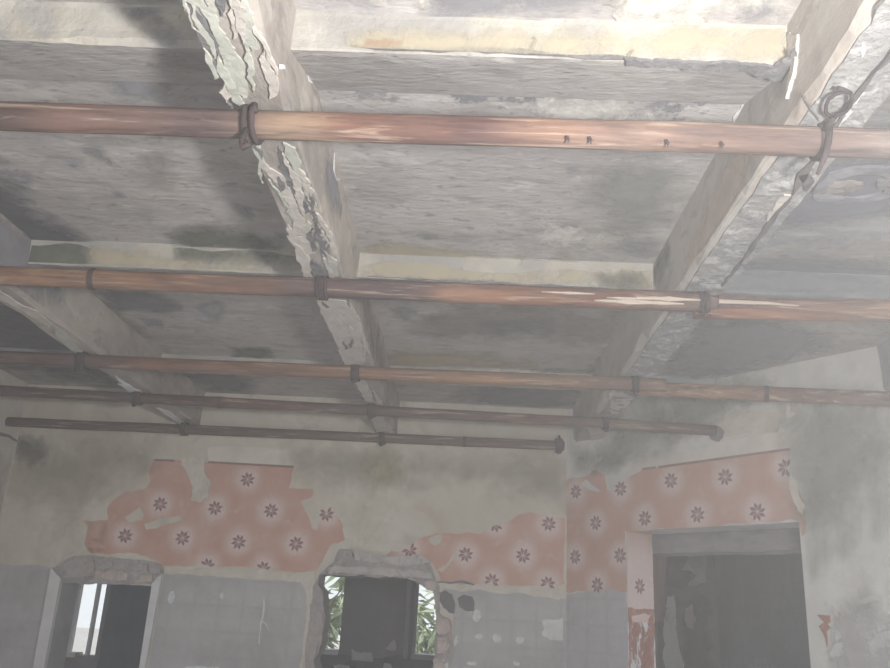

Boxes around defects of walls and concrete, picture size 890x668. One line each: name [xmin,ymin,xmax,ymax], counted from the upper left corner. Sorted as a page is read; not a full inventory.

peeling [180,0,286,109]
leakage [356,32,619,54]
peeling [613,0,762,24]
peeling [251,140,339,278]
peeling [0,563,51,668]
peeling [148,549,628,668]